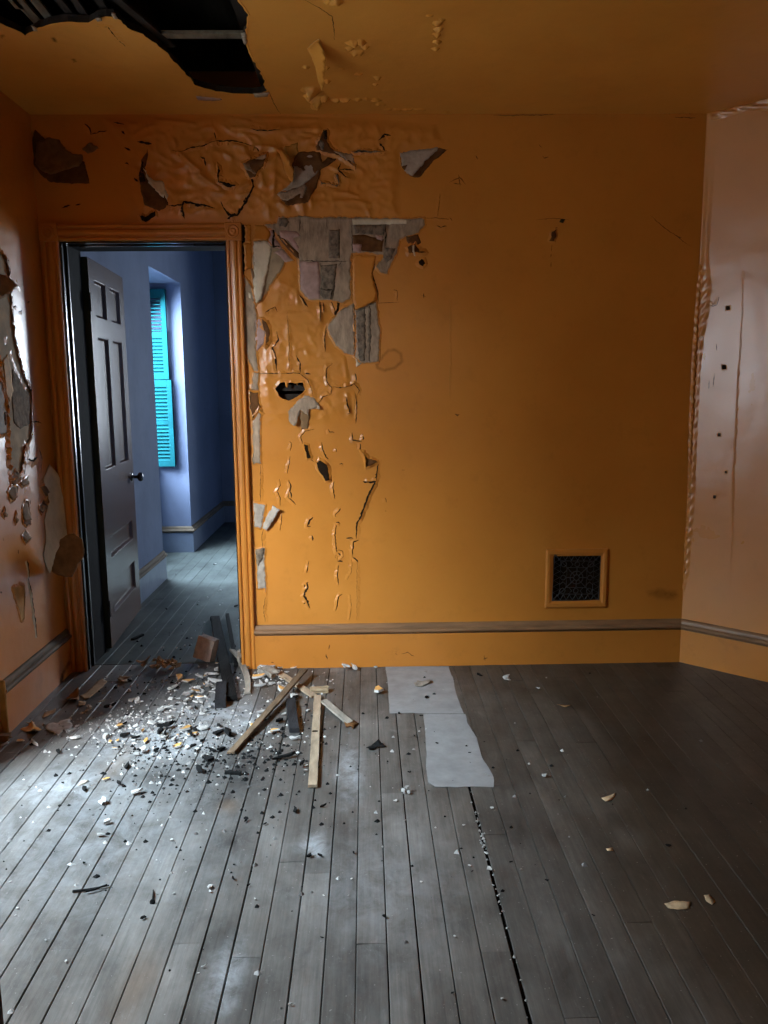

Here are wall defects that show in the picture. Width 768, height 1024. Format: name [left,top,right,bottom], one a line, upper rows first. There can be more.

spalling [41,0,110,16]
spalling [146,0,255,71]
peeling [307,39,326,92]
peeling [0,247,11,278]
peeling [242,215,429,465]
peeling [0,292,50,545]
crack [252,264,394,622]
peeling [251,501,267,530]